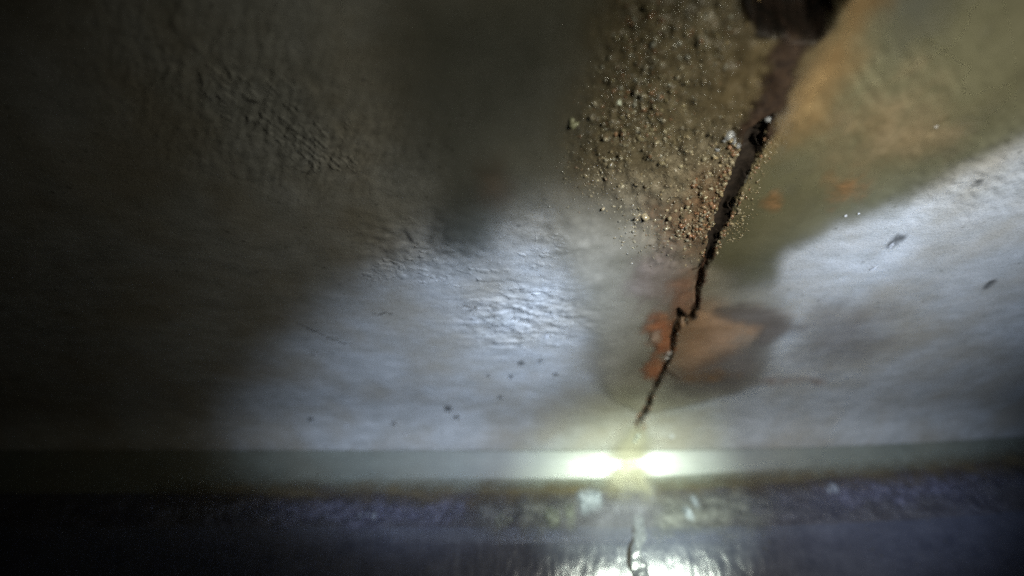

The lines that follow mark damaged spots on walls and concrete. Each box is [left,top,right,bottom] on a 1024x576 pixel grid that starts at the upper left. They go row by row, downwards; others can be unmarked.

spalling [362,0,833,365]
corrosion [645,279,763,378]
crack [632,17,812,430]